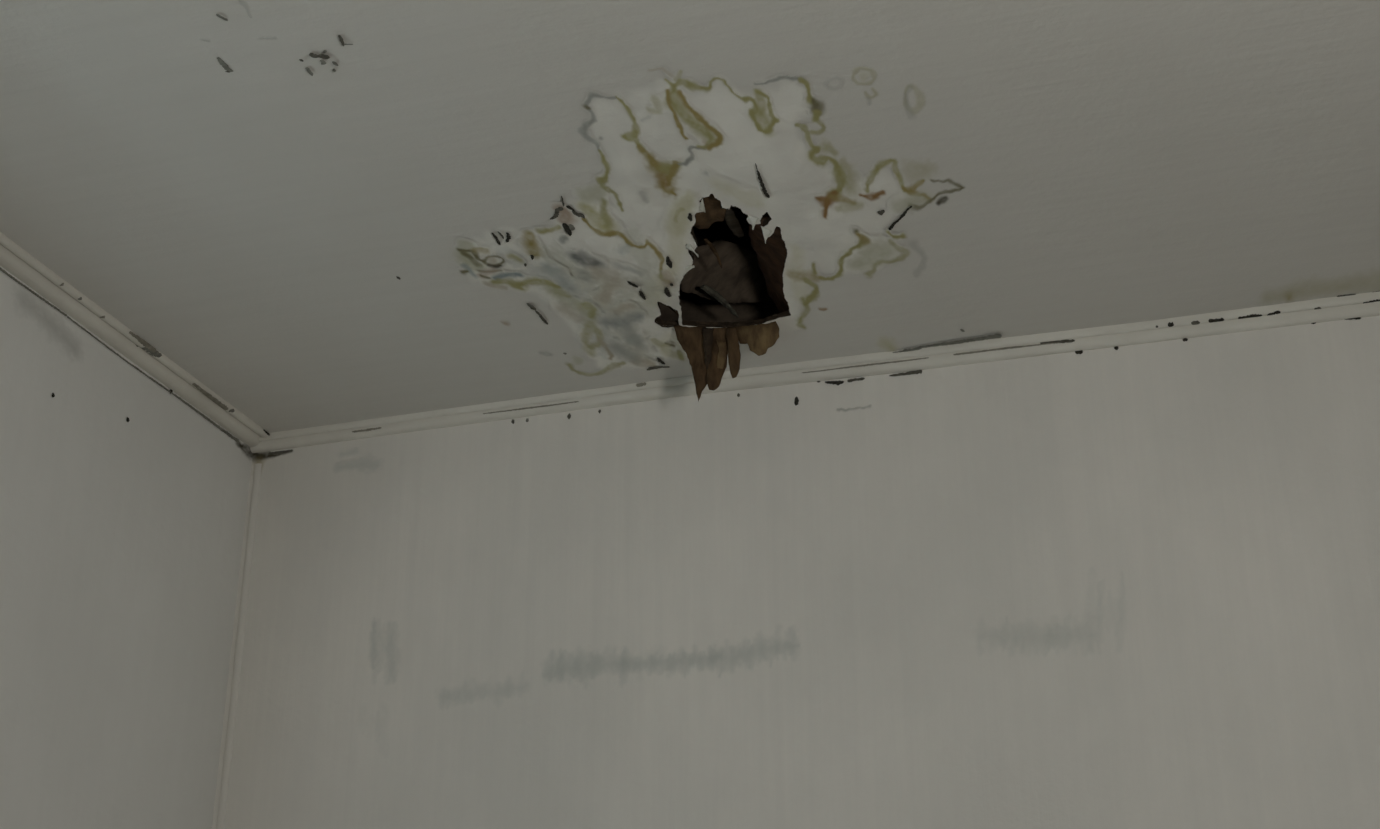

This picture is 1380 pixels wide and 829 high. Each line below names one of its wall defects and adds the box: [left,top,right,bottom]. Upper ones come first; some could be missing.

leakage [442,65,967,378]
spalling [692,206,769,251]
spalling [657,284,779,323]
peeling [1156,311,1280,341]
peeling [1040,339,1083,354]